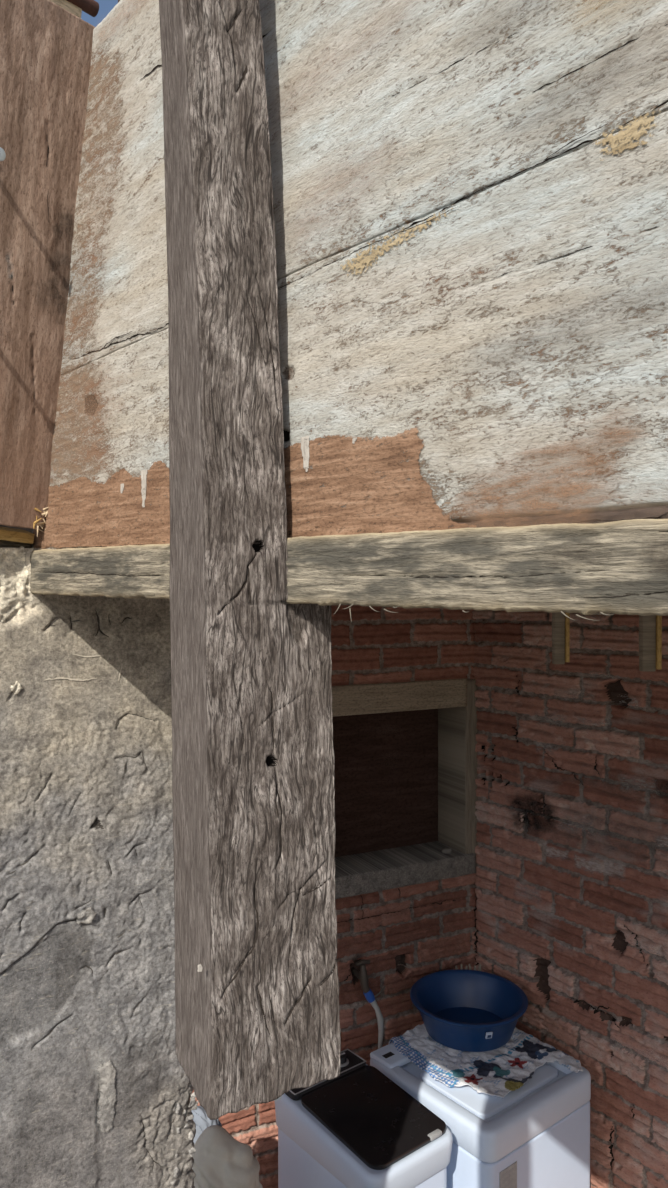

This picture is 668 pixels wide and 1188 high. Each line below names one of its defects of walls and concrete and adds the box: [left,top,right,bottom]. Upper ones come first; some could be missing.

crack [247,100,668,410]
peeling [0,460,170,622]
peeling [284,428,635,538]
crack [0,852,151,977]